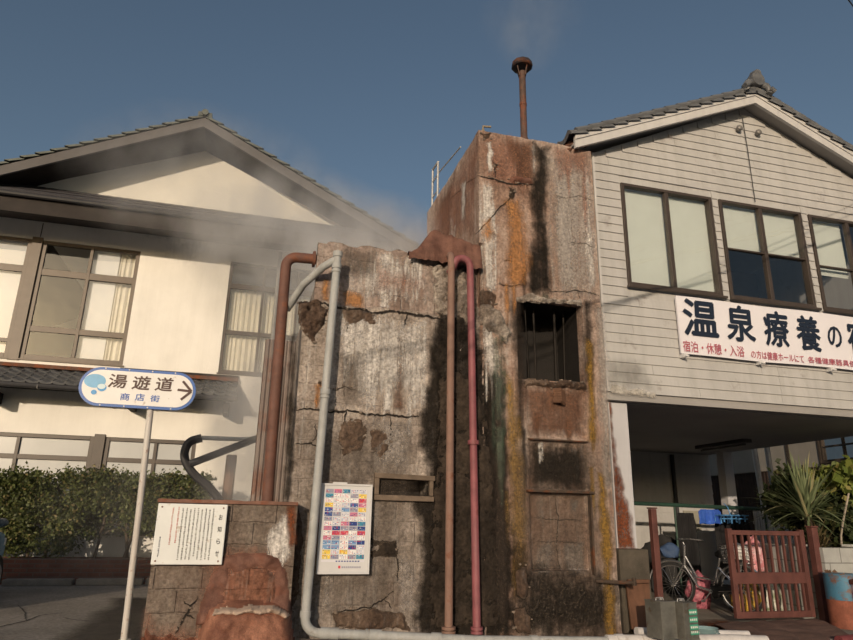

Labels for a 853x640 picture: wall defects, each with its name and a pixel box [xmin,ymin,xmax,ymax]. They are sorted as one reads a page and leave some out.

crack [448,162,593,234]
spalling [298,299,329,343]
spalling [342,308,376,327]
crack [297,301,444,331]
damp [340,142,634,636]
crack [295,384,419,446]
spalling [336,417,393,460]
spalling [332,607,411,631]